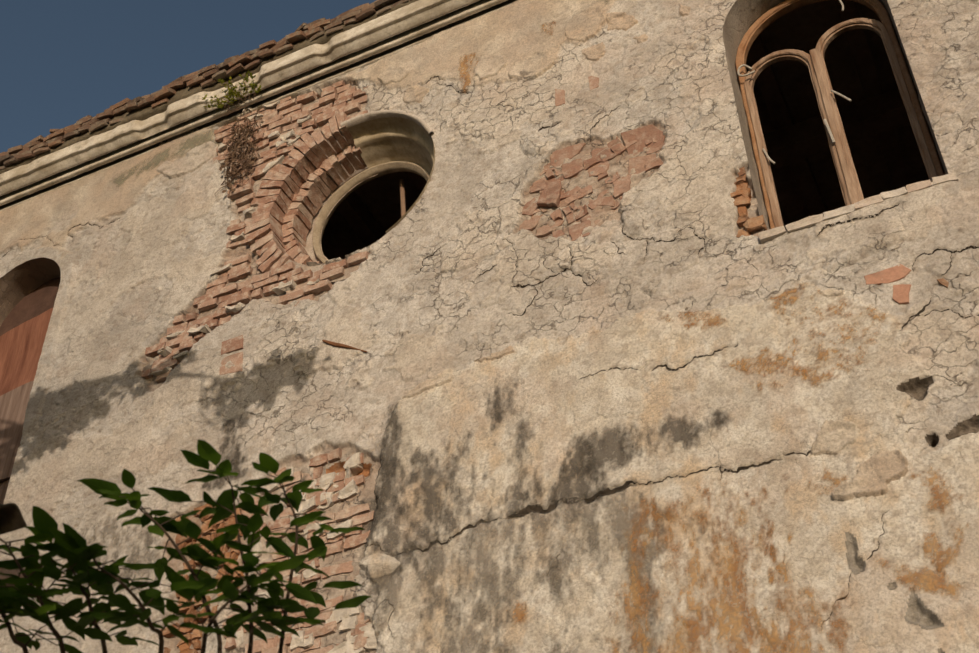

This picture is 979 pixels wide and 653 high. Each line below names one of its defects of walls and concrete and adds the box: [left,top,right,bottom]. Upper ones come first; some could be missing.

flaking render [519,124,665,241]
flaking render [141,80,370,383]
crack [480,239,597,316]
crack [900,299,979,331]
crack [912,245,979,275]
leakage [489,383,516,430]
leakage [648,412,728,447]
spalling [896,376,934,400]
spalling [925,414,979,447]
flaking render [160,448,378,653]
leakage [360,409,664,653]
crack [370,450,811,554]